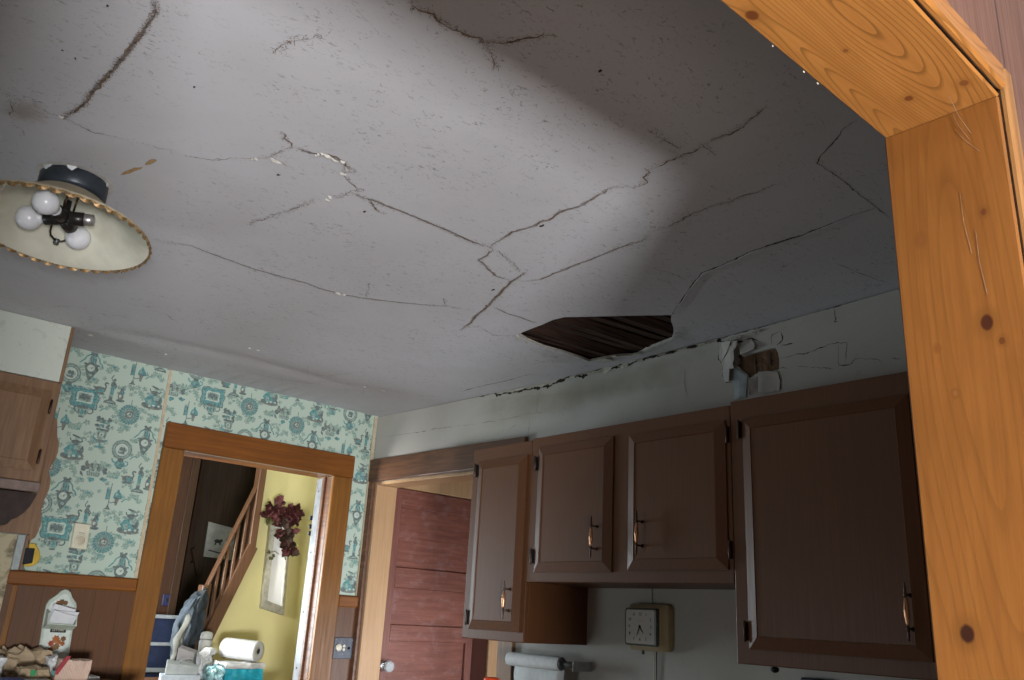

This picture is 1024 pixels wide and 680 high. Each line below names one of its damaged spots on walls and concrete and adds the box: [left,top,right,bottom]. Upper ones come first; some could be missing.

crack [1,0,781,336]
crack [816,121,886,215]
spalling [718,339,781,400]